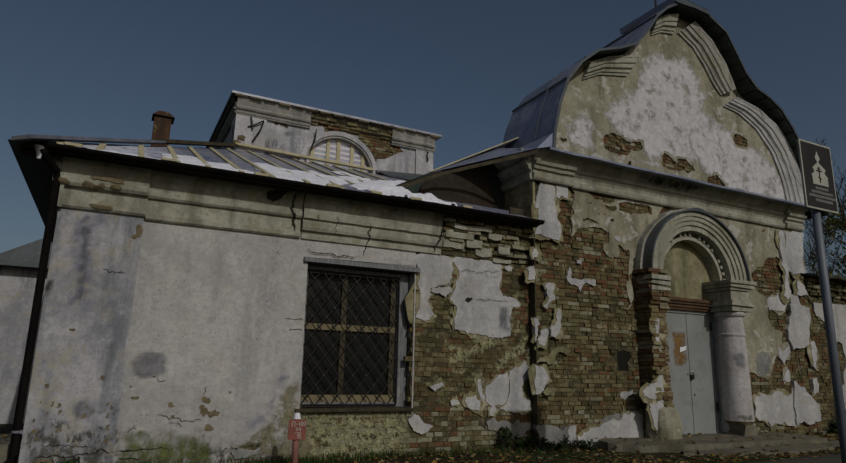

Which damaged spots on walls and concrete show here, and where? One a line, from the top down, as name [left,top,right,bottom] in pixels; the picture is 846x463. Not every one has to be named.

peeling [559,116,594,149]
peeling [603,53,786,200]
crack [289,193,297,231]
crack [308,226,372,258]
flaking render [231,182,673,461]
flaking render [749,229,845,435]
water stain [134,353,165,377]
peeling [199,396,220,431]
crack [35,428,169,460]